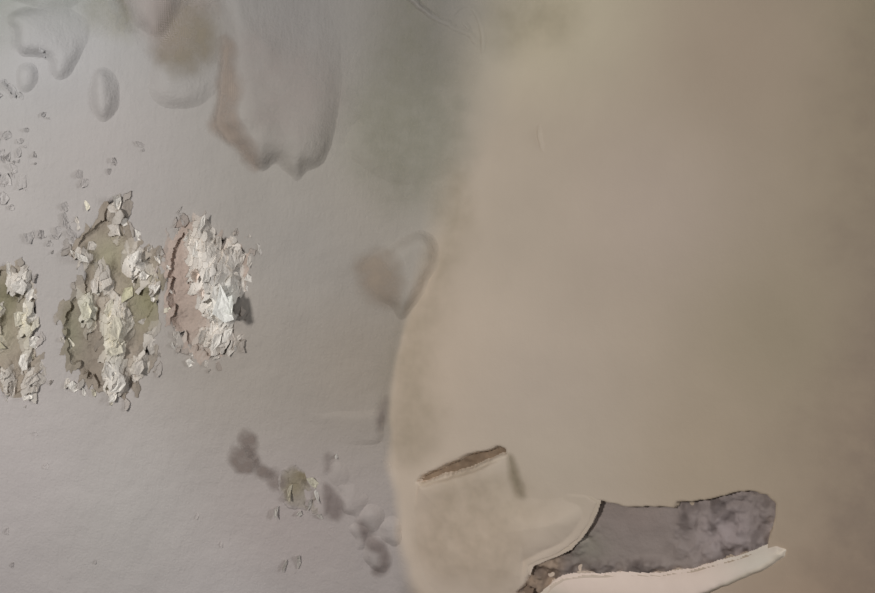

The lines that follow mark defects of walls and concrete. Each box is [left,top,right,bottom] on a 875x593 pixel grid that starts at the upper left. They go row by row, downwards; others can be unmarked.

peeling [0,128,37,210]
flaking render [0,257,53,408]
flaking render [24,191,262,411]
peeling [274,464,323,519]
flaking render [414,447,786,593]